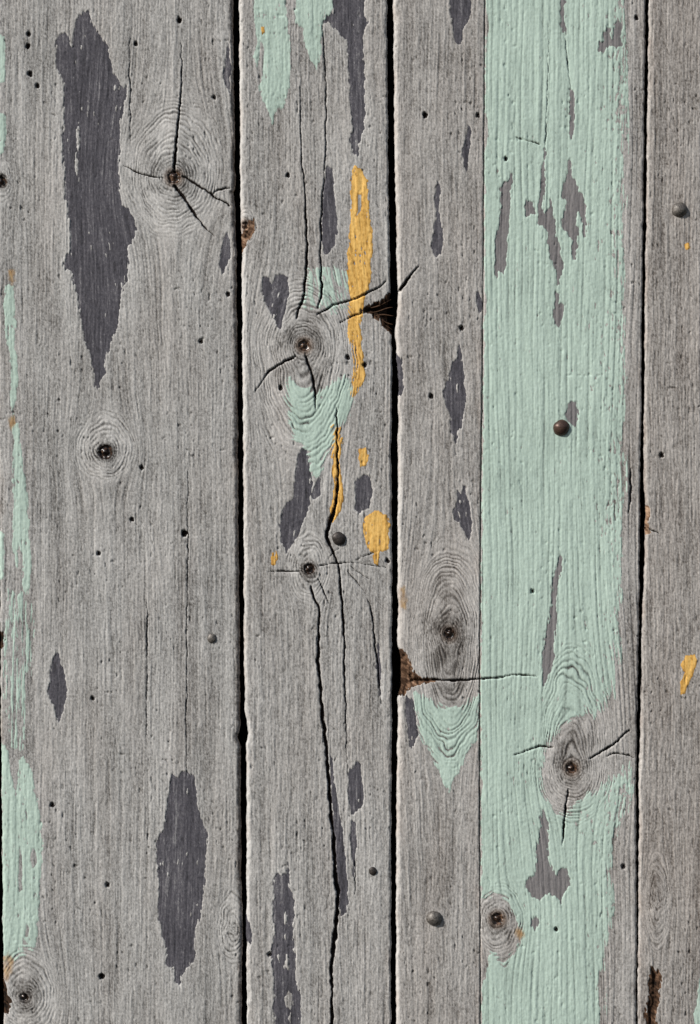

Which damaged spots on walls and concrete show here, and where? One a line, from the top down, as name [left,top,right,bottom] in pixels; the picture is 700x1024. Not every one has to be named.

peeling [55,11,137,390]
crack [125,45,230,235]
peeling [253,0,391,566]
crack [296,26,419,323]
peeling [0,284,44,962]
peeling [156,771,208,985]
peeling [271,863,302,1024]
crack [256,356,386,1024]
crack [414,674,530,682]
peeling [405,0,635,1024]
crack [561,790,569,844]
crack [590,730,634,759]